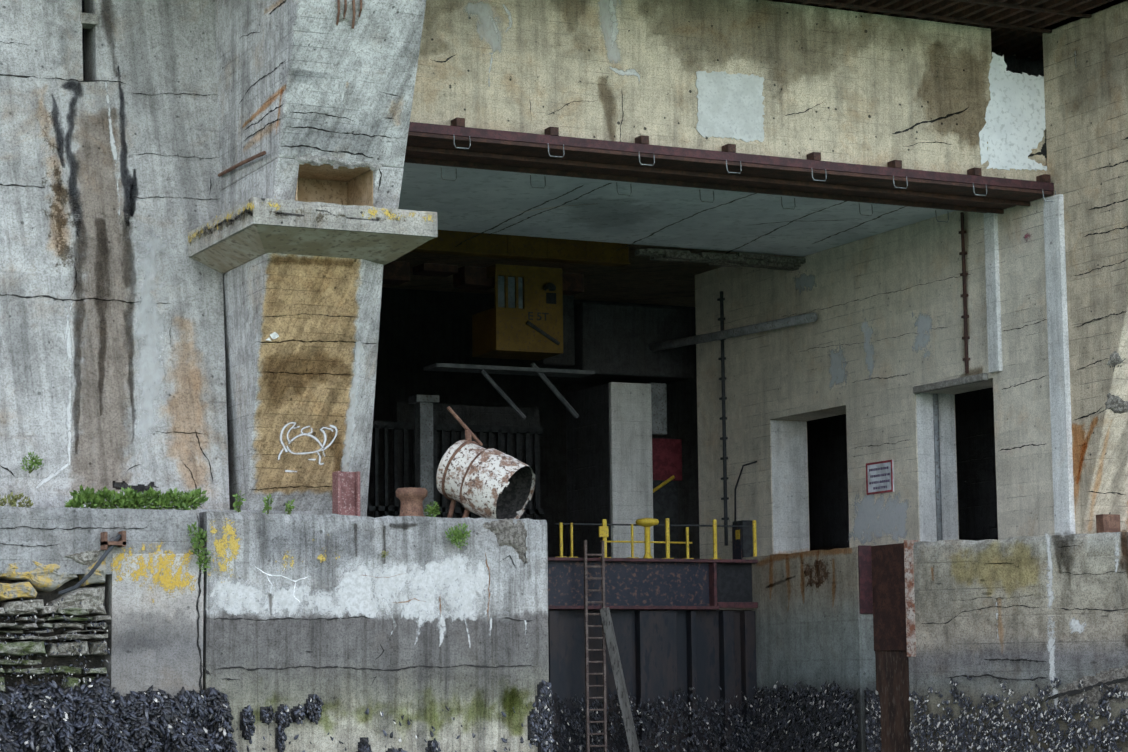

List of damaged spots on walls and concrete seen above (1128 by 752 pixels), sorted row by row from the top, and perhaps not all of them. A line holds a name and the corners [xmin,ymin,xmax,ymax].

leakage [42,81,83,265]
leakage [105,66,138,226]
crack [239,60,398,158]
crack [892,107,969,147]
peeling [979,52,1047,171]
crack [1,262,172,347]
leakage [36,303,80,489]
crack [157,430,213,489]
leakage [206,553,499,647]
rust [792,559,829,588]
crack [922,595,1128,624]
rust [1115,530,1128,574]